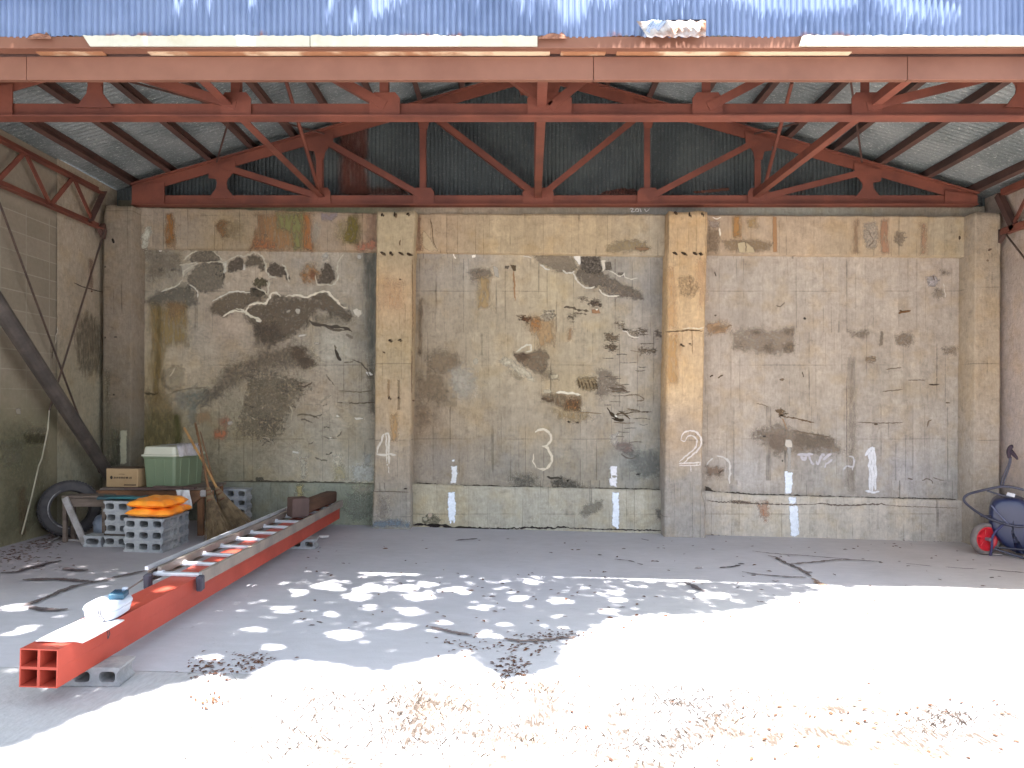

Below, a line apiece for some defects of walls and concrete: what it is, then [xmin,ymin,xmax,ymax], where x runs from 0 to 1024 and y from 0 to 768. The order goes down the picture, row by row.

spalling [164,250,290,293]
spalling [315,254,344,286]
spalling [573,256,623,277]
damp [175,253,376,444]
damp [753,384,847,473]
crack [705,477,958,509]
crack [685,582,705,591]
crack [719,551,881,605]